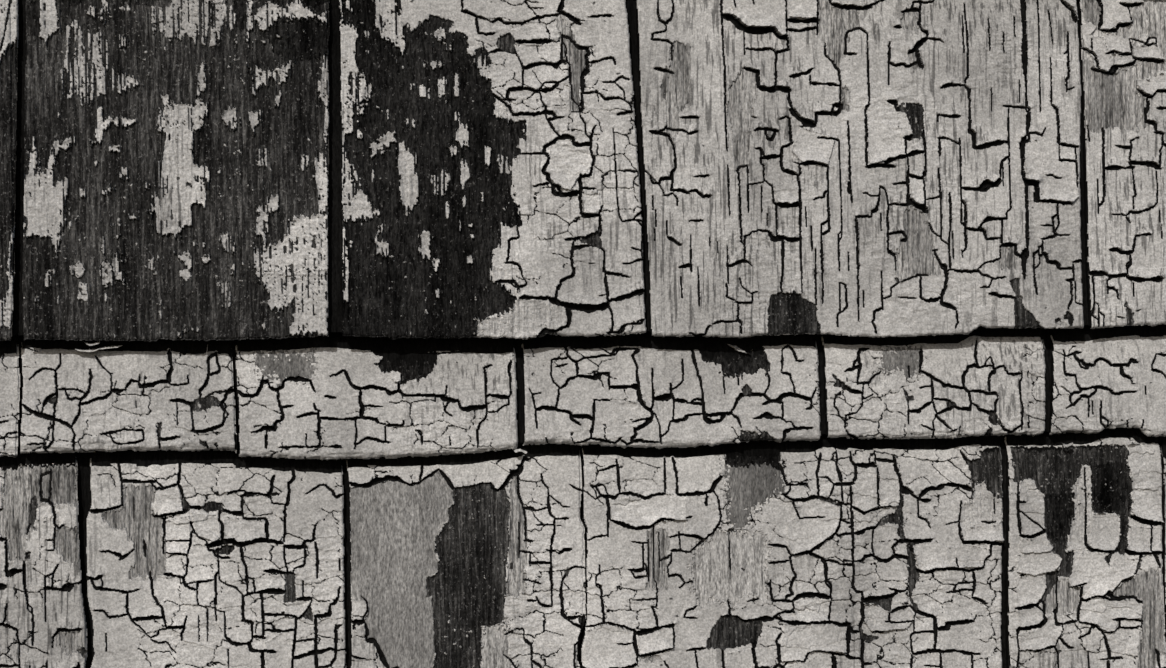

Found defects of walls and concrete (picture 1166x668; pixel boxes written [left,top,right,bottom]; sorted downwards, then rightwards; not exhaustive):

peeling [0,0,483,360]
peeling [485,146,511,175]
peeling [475,265,567,339]
peeling [545,139,601,215]
crack [461,0,711,339]
peeling [579,229,602,249]
peeling [767,290,821,336]
crack [689,0,1166,337]
peeling [426,476,529,668]
crack [0,340,1166,668]
peeling [611,494,776,668]
peeling [780,443,1166,668]